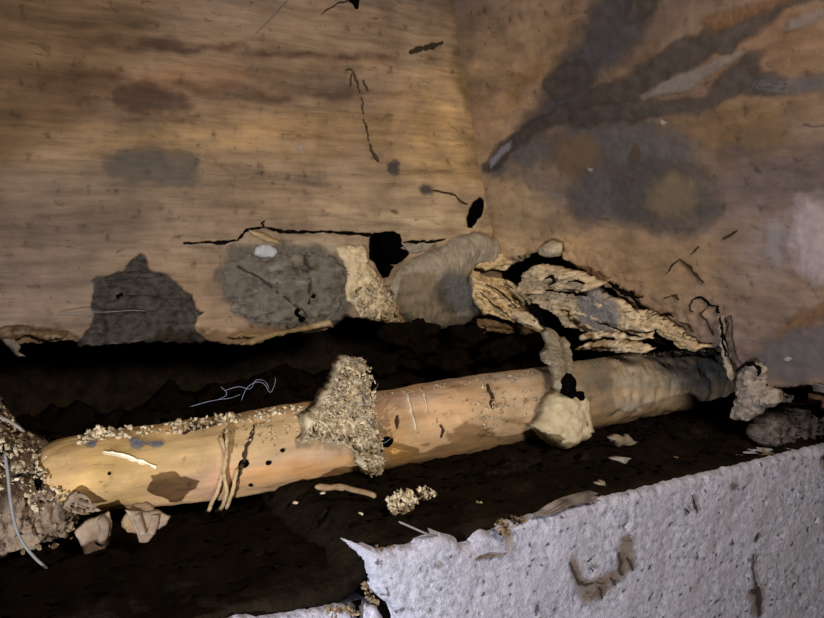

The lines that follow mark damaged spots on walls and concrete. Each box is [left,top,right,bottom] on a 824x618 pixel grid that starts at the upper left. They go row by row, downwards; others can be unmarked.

crack [345,68,379,162]
water stain [483,0,824,232]
peeling [92,271,164,282]
peeling [178,289,204,318]
crack [236,255,312,318]
crack [183,220,372,245]
peeling [239,294,334,346]
crack [432,190,468,205]
peeling [468,252,712,352]
crack [606,246,720,336]
water stain [768,197,824,283]
crack [747,532,763,617]